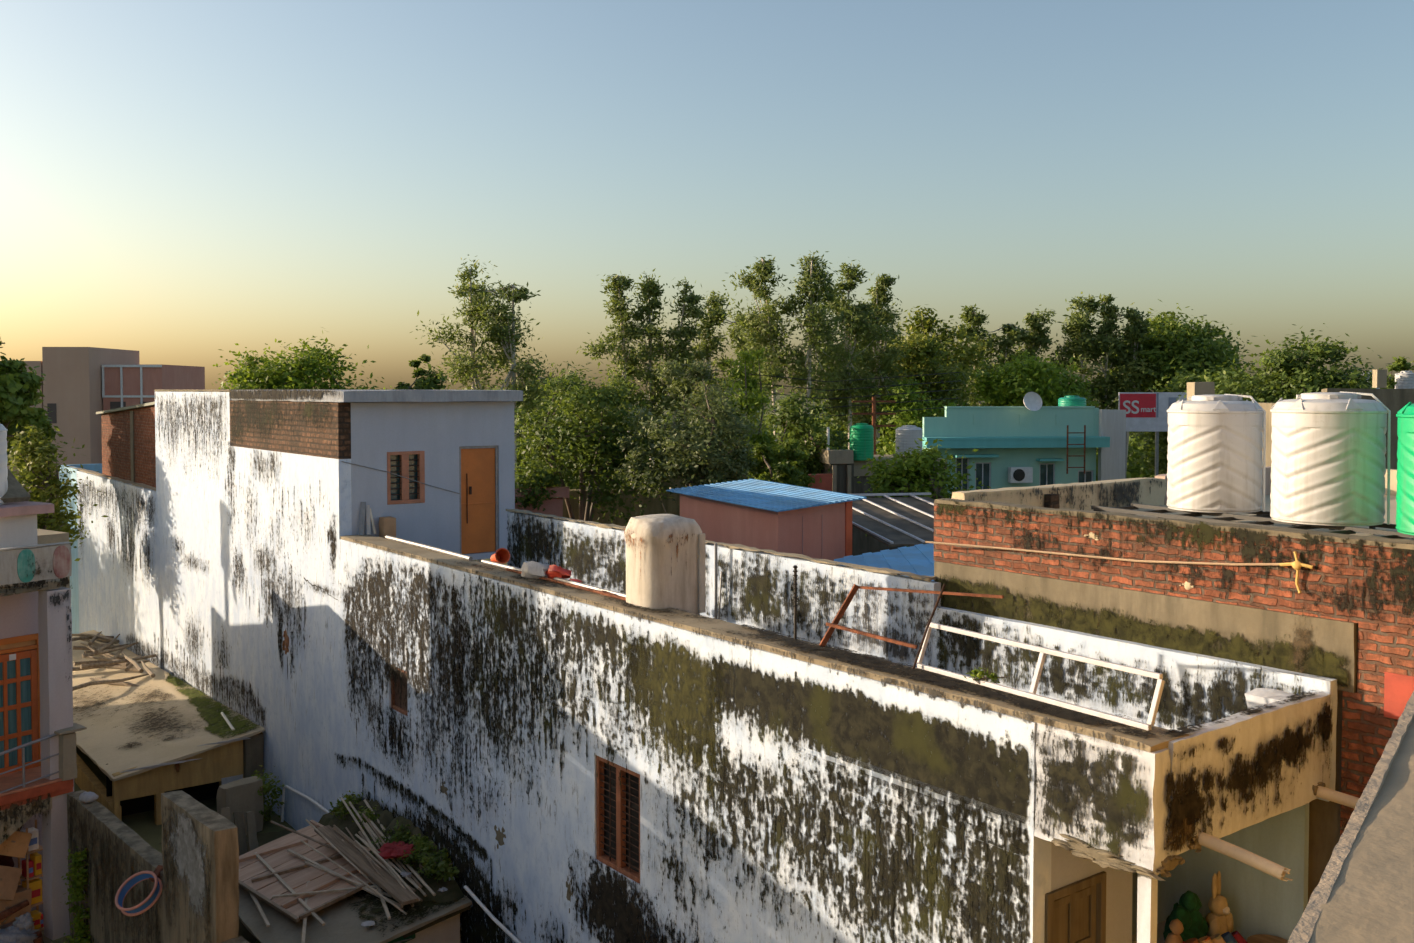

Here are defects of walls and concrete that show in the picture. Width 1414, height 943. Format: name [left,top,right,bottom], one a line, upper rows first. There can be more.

water stain [68,676,204,748]
water stain [126,607,265,726]
water stain [153,389,1414,943]
water stain [0,793,50,829]
water stain [68,798,212,943]